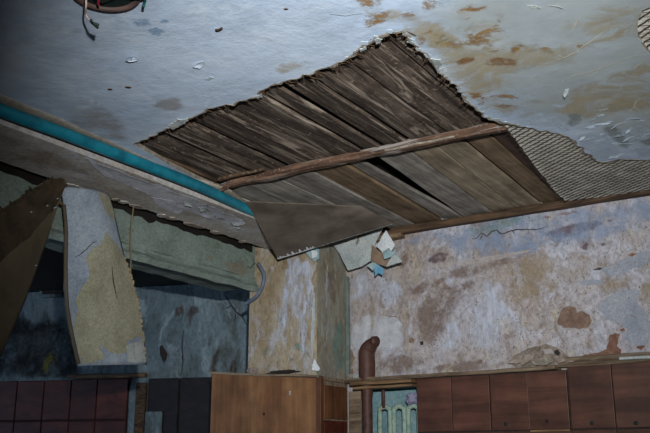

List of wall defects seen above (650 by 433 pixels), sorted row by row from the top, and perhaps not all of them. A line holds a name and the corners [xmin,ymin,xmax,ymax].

peeling [405,33,578,129]
damp [448,0,650,134]
peeling [169,118,188,130]
peeling [579,109,650,159]
peeling [86,158,246,234]
crack [474,227,544,239]
peeling [74,232,142,363]
damp [282,258,314,351]
spalling [556,305,593,331]
spalling [583,328,625,356]